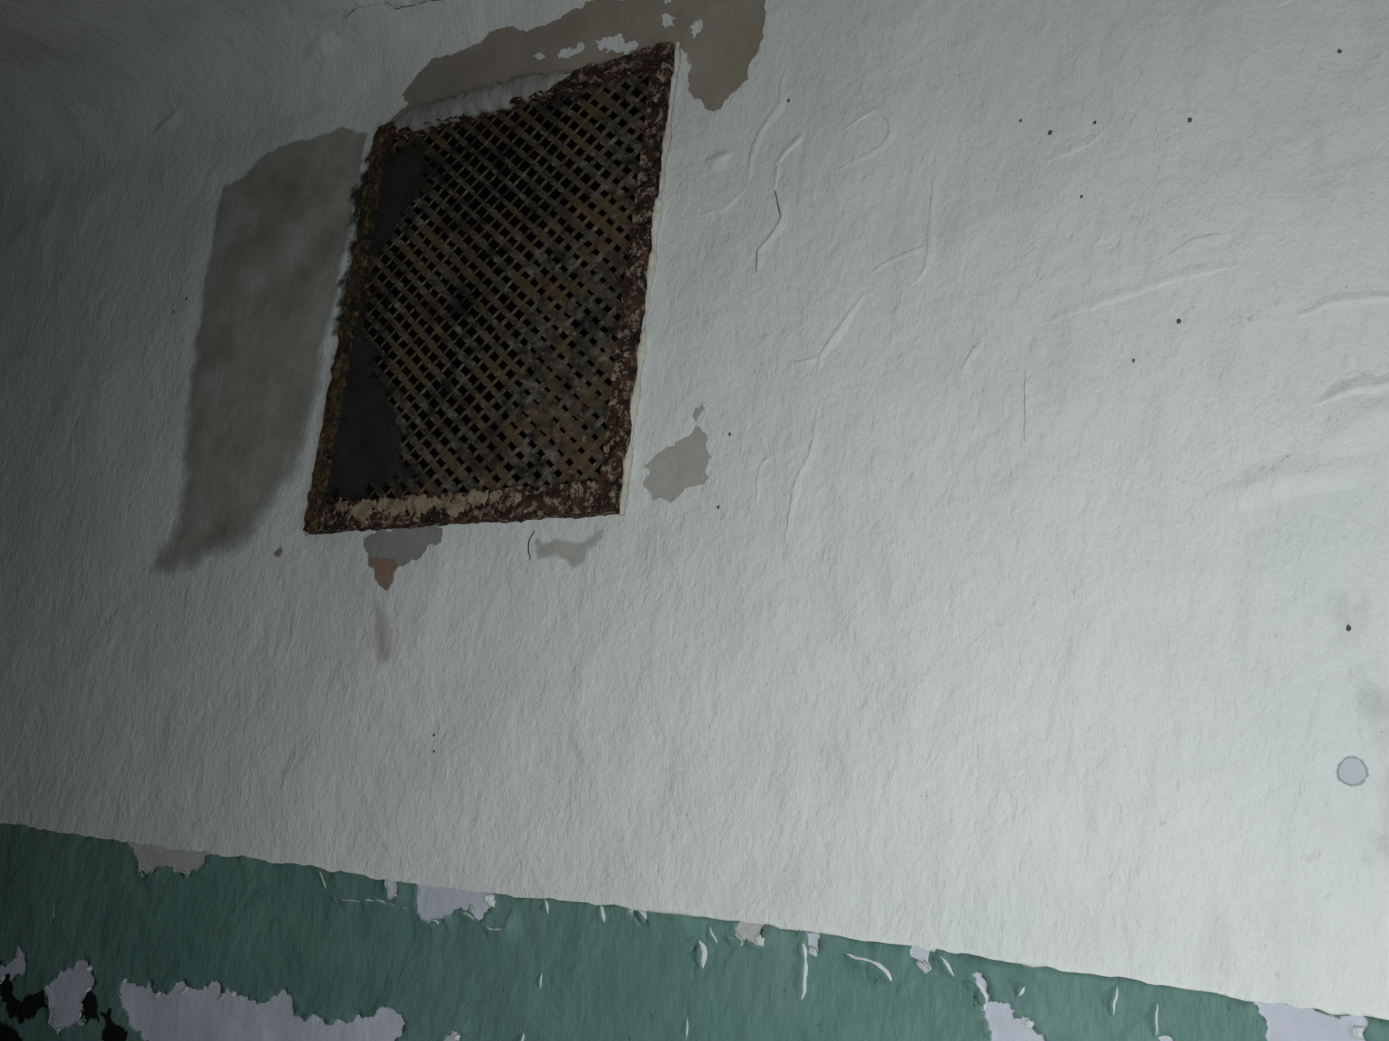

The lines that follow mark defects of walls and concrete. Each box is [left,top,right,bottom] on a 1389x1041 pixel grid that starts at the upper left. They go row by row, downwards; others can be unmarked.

flaking render [162,0,766,566]
flaking render [334,488,522,590]
peeling [129,842,211,879]
peeling [386,879,498,924]
peeling [0,946,26,984]
peeling [734,921,765,946]
peeling [807,932,820,957]
peeling [910,946,941,974]
peeling [43,960,95,1033]
peeling [119,979,405,1041]
peeling [973,972,1044,1041]
peeling [1254,1002,1374,1041]